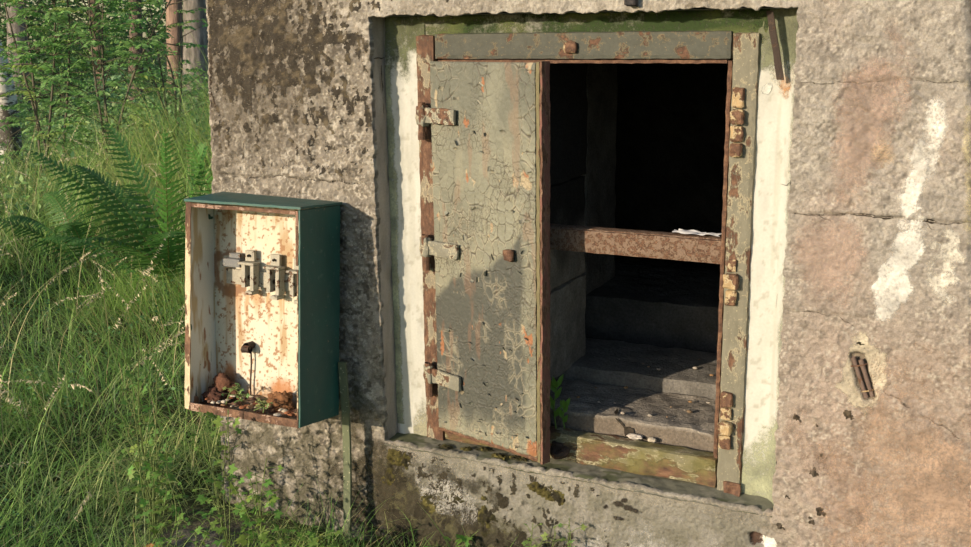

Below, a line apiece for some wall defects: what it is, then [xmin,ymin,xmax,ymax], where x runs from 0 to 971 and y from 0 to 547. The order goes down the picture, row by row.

damp [871,100,971,321]
spalling [836,332,887,416]
damp [330,433,573,547]